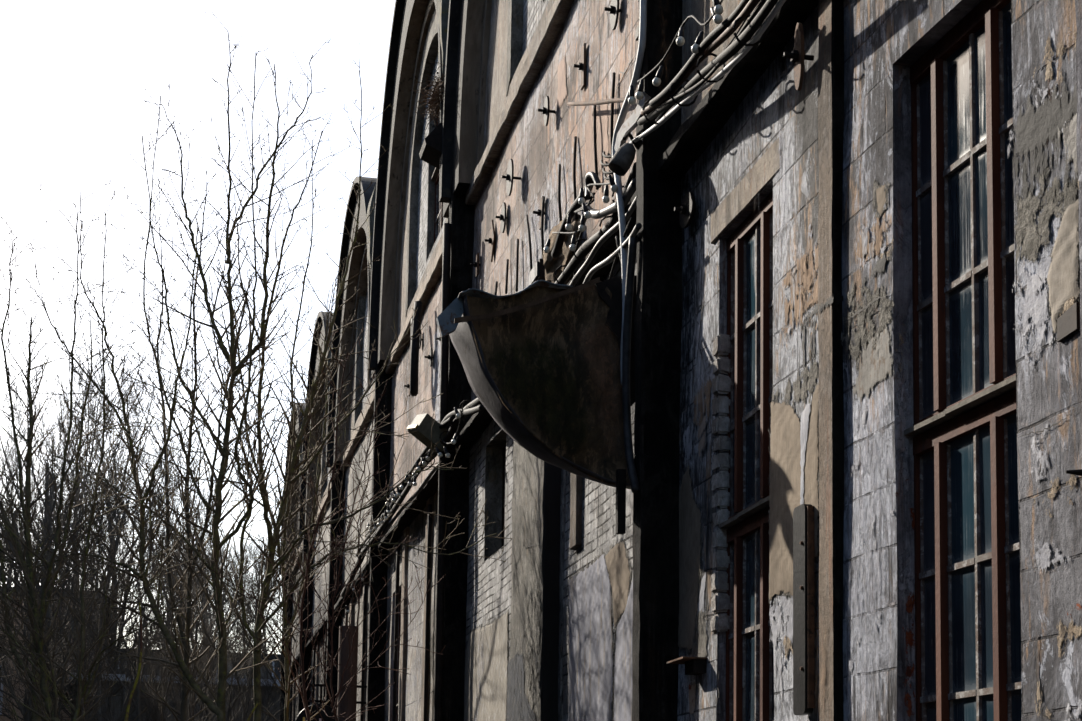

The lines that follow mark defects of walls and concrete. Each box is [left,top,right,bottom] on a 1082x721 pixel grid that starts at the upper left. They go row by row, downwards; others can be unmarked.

spalling [1030,31,1077,107]
peeling [855,180,893,262]
spalling [1012,113,1082,371]
spalling [841,282,911,379]
peeling [772,222,819,561]
peeling [1031,424,1078,518]
spalling [678,493,709,657]
peeling [568,537,633,721]
peeling [769,591,793,705]
spalling [1056,619,1082,658]
spalling [1035,681,1051,719]